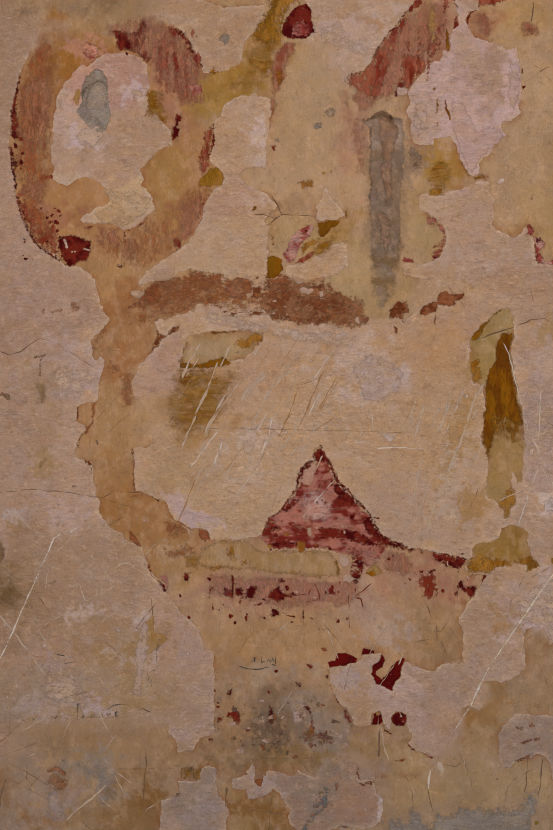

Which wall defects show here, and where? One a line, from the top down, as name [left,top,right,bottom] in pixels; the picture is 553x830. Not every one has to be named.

spalling [73,69,111,133]
crack [255,197,312,226]
peeling [179,330,263,368]
peeling [467,308,534,519]
peeling [275,446,365,516]
peeling [315,527,381,546]
peeling [133,598,167,702]